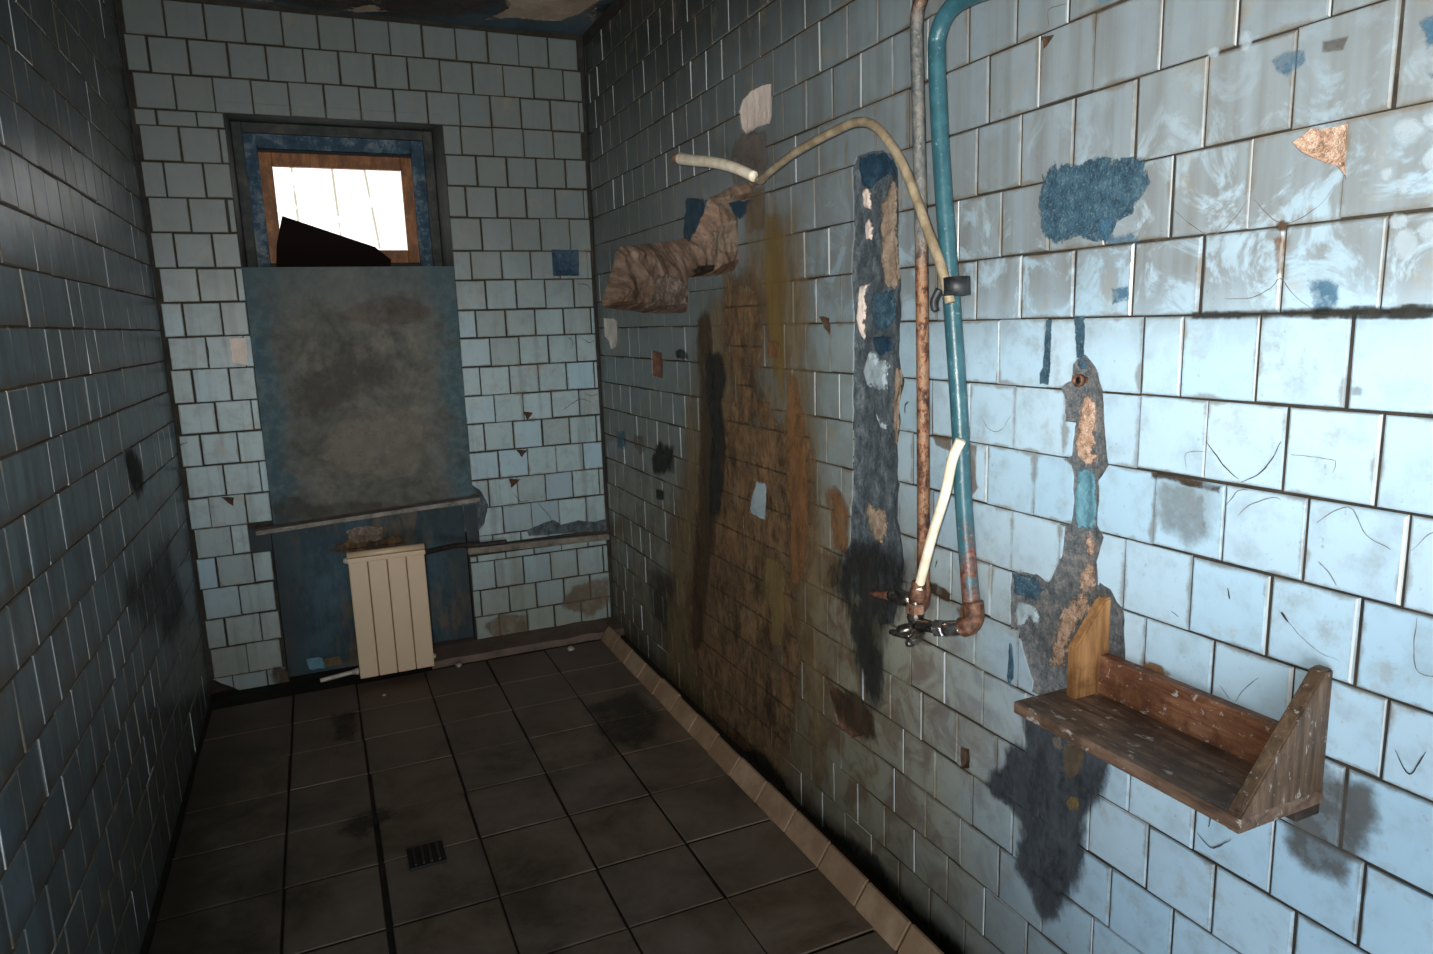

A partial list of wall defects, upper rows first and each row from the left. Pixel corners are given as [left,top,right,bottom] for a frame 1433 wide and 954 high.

peeling [346,0,390,12]
peeling [486,0,599,21]
peeling [740,84,773,134]
spalling [1293,124,1348,176]
corrosion [1274,221,1289,249]
spalling [602,178,769,349]
spalling [843,150,905,625]
corrosion [934,436,951,450]
corrosion [1152,472,1220,492]
spalling [1007,355,1125,695]
corrosion [930,583,963,617]
leakage [986,718,1109,921]